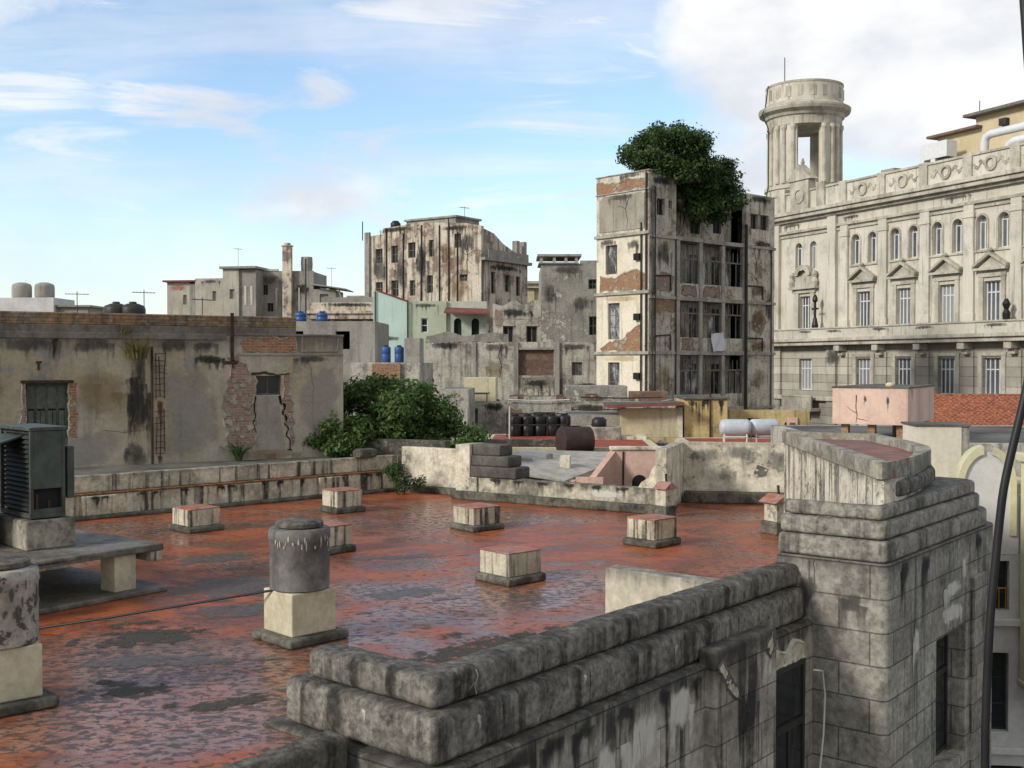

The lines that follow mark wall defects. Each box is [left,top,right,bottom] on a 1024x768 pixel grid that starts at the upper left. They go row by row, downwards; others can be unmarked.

spalling [596,177,645,195]
damp [374,247,429,283]
damp [441,225,474,259]
spalling [599,269,675,313]
damp [0,323,296,367]
spalling [600,324,640,352]
spalling [67,382,81,438]
damp [127,361,151,429]
spalling [220,336,298,450]
crack [253,369,315,451]
damp [602,705,646,768]
damp [660,676,702,751]